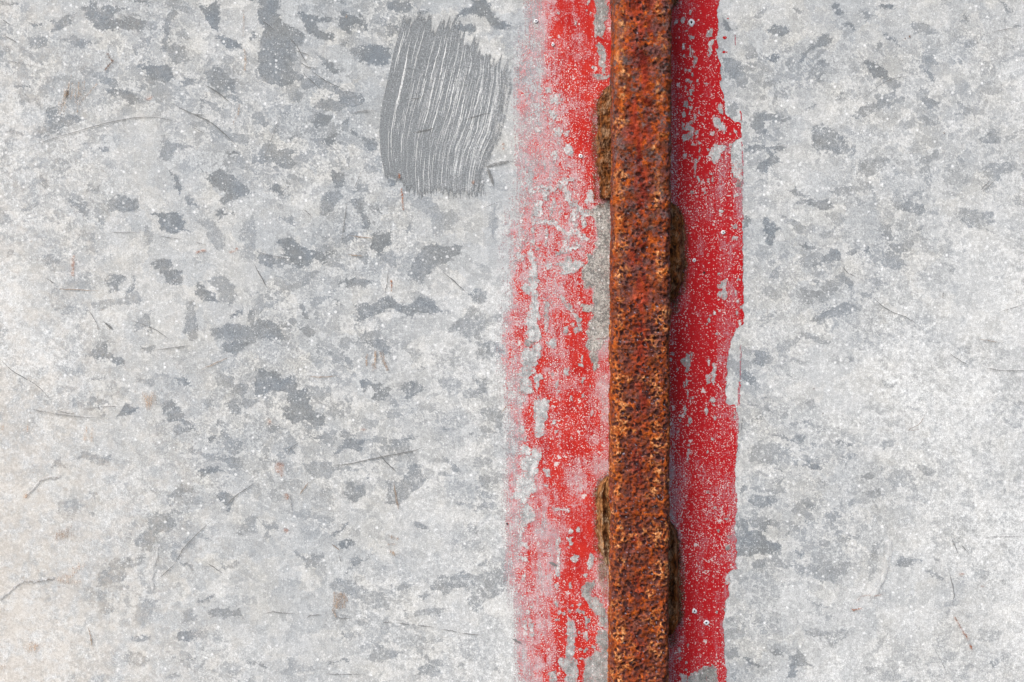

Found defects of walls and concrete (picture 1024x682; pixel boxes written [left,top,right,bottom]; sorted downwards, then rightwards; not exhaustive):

peeling [586,0,610,80]
peeling [534,87,574,161]
peeling [674,11,743,197]
peeling [717,273,742,326]
peeling [510,177,611,581]
peeling [670,352,694,433]
peeling [704,358,717,420]
peeling [548,526,609,682]
peeling [678,644,718,682]